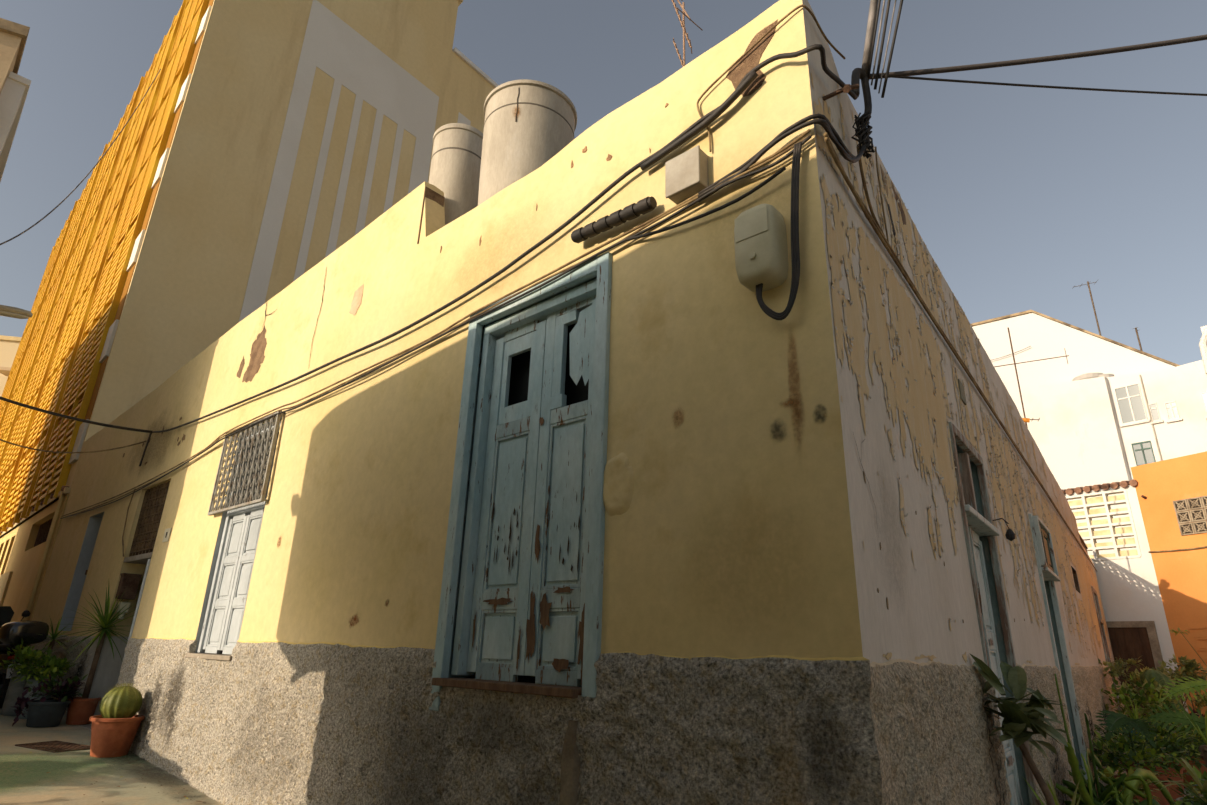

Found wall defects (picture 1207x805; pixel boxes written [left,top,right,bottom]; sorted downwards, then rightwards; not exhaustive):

spalling [726,19,778,97]
spalling [237,325,267,383]
peeling [811,73,1112,659]
peeling [471,597,514,652]
peeling [516,586,574,669]